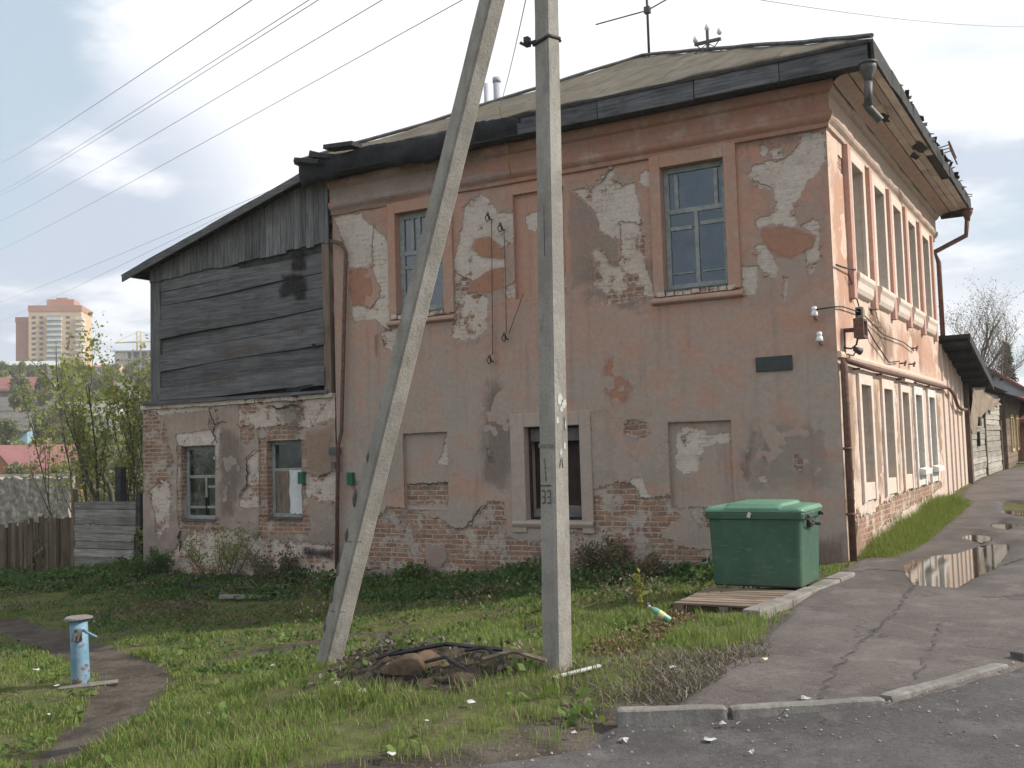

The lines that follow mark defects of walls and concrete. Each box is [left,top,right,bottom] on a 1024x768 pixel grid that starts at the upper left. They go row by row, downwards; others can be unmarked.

flaking render [334,211,398,352]
flaking render [450,193,537,341]
flaking render [574,166,654,306]
flaking render [742,244,789,301]
flaking render [747,130,842,275]
flaking render [141,393,348,579]
flaking render [364,483,541,579]
flaking render [624,419,650,440]
flaking render [569,476,712,571]
flaking render [672,426,732,475]
crack [815,568,918,700]